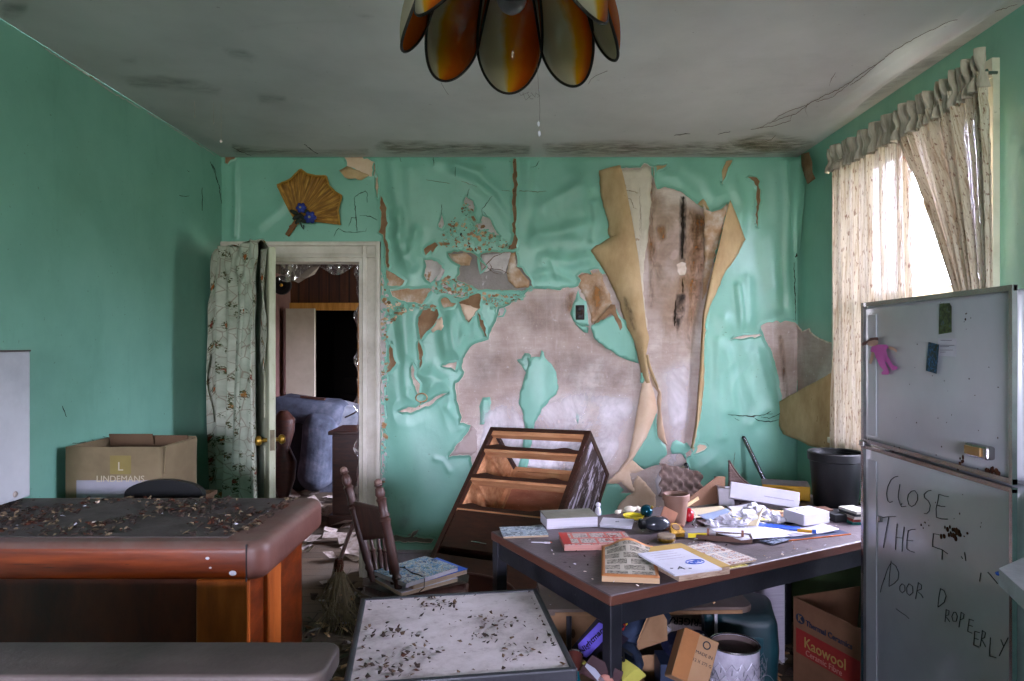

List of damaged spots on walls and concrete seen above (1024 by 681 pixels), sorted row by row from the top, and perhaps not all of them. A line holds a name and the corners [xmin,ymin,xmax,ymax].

crack [718,20,954,142]
crack [334,191,377,235]
flaking render [749,177,760,223]
peeling [801,152,815,184]
peeling [339,157,746,516]
peeling [736,318,832,448]